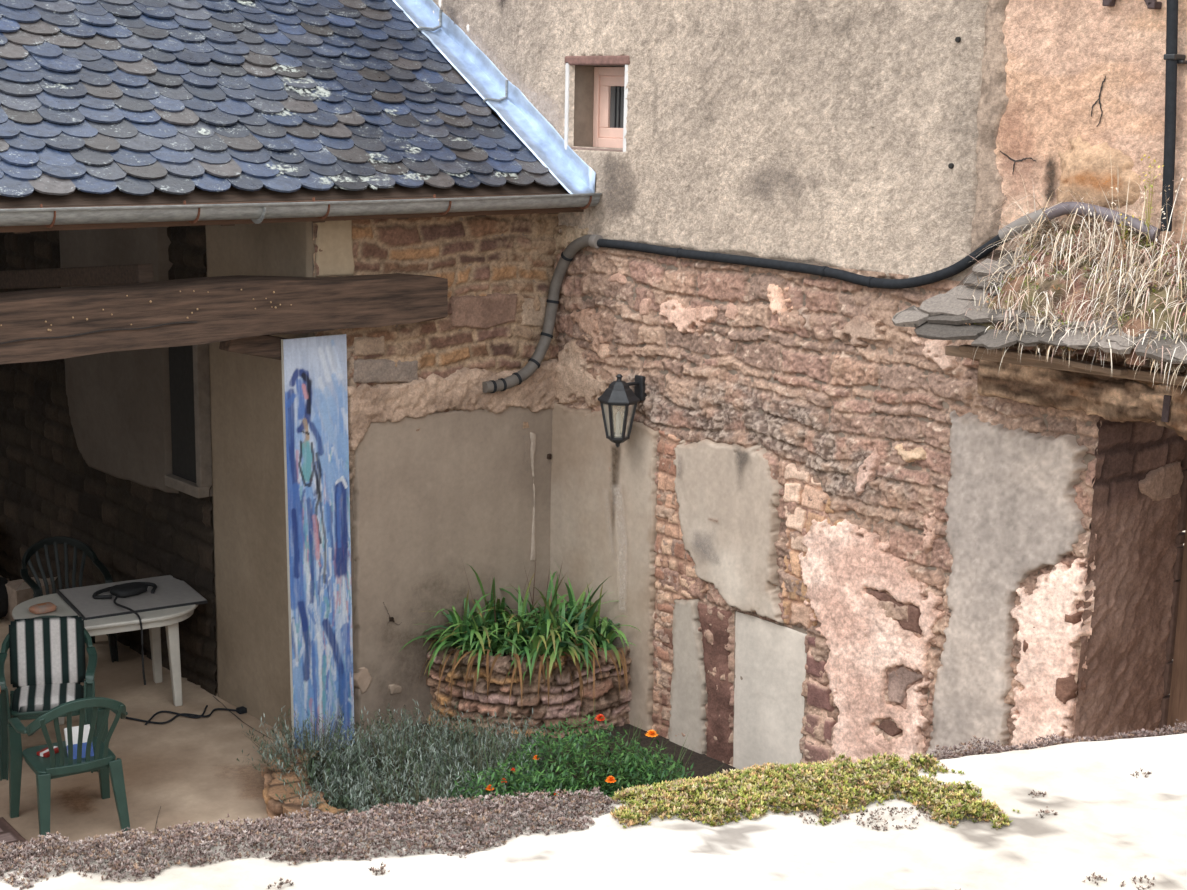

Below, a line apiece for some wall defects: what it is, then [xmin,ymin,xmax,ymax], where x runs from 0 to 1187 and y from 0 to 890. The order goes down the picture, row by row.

crack [1091,76,1106,127]
crack [1000,151,1036,172]
flaking render [312,213,1102,764]